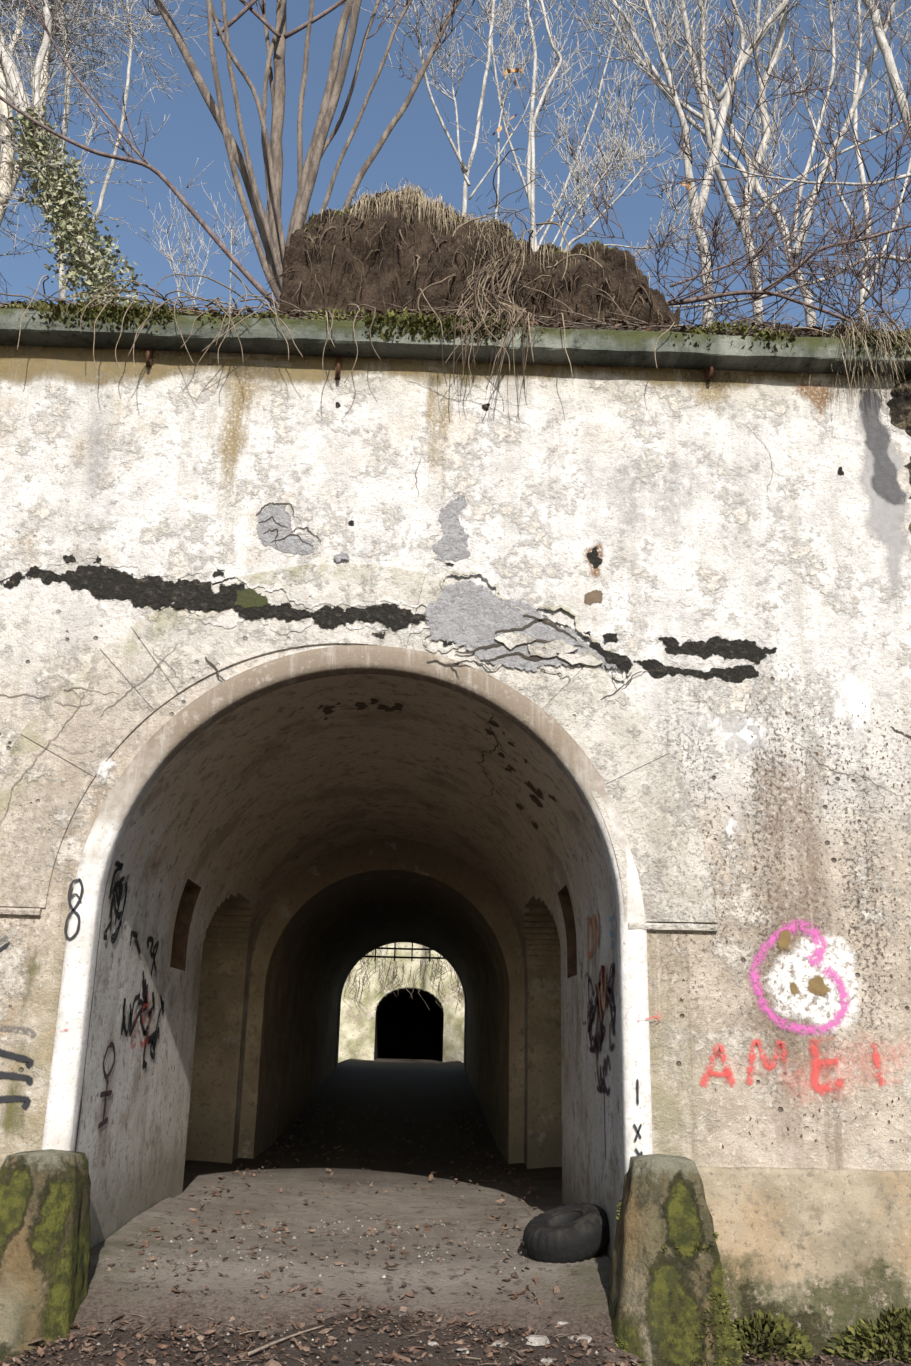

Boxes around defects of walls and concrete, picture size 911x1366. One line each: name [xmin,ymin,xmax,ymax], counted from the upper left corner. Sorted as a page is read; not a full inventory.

damp [0,345,831,459]
spalling [0,489,777,738]
corrosion [585,544,603,576]
crack [0,645,225,823]
peeling [484,721,556,830]
crack [776,732,909,810]
spalling [704,701,911,1021]
spalling [787,1097,909,1148]